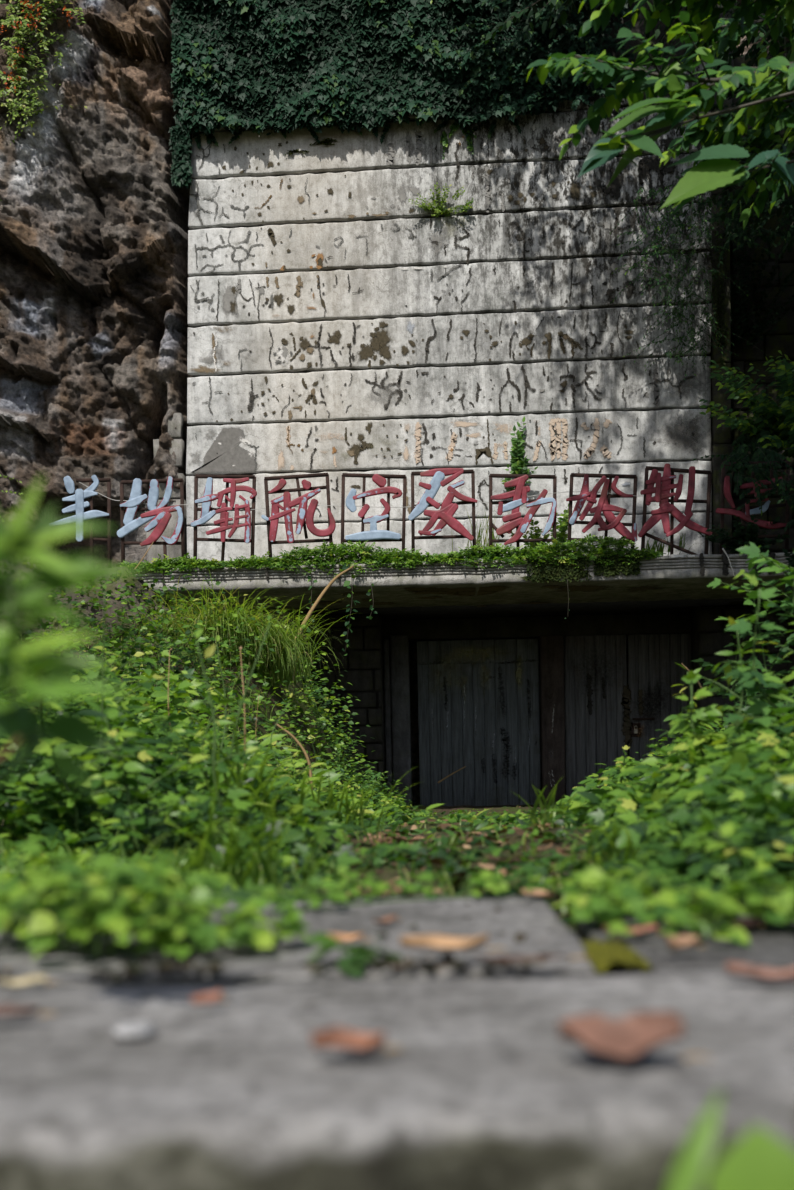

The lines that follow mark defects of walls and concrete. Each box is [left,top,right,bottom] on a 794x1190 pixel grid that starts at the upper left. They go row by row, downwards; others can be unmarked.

crack [190,144,695,517]